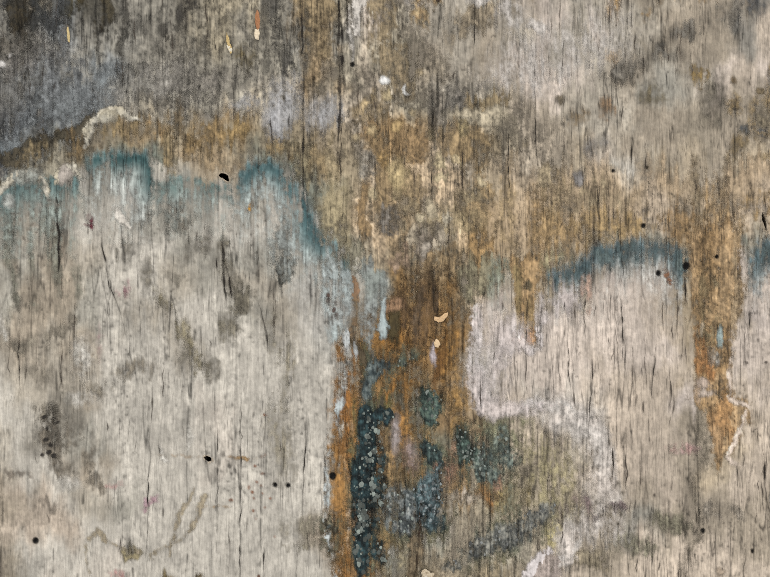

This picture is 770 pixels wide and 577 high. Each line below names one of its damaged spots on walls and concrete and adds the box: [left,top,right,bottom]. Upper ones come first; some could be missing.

rust [320,282,503,577]
water stain [350,352,626,577]
rust [687,217,751,470]